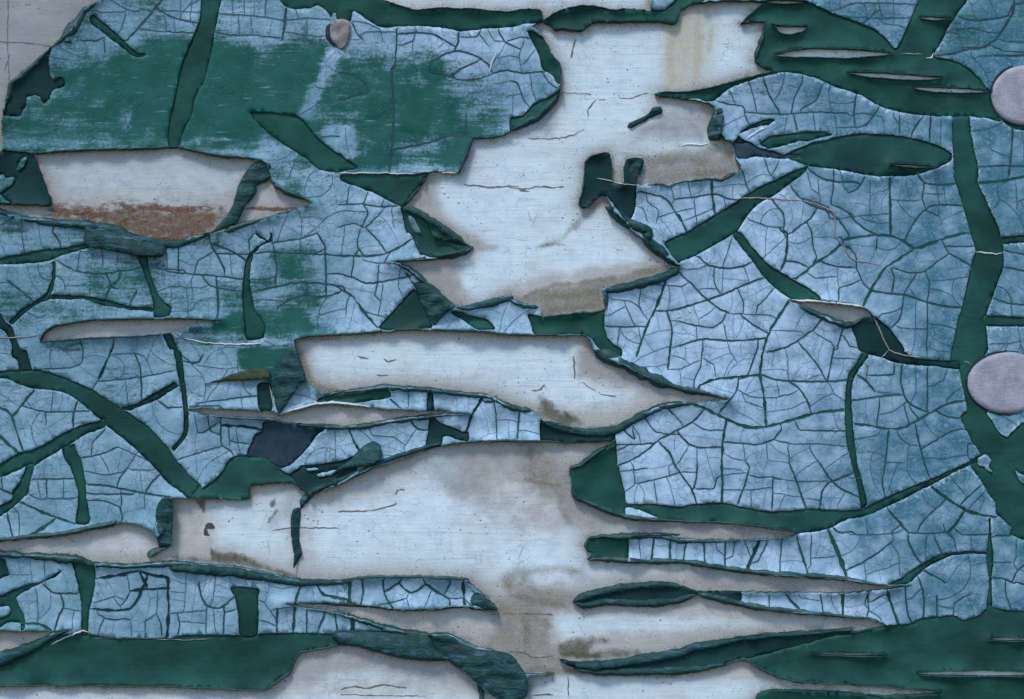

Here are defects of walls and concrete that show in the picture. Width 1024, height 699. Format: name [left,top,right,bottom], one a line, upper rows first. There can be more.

rust [50,203,222,240]
peeling [0,0,313,257]
crack [0,0,328,149]
crack [0,112,553,639]
peeling [0,289,1024,699]
peeling [280,0,1024,327]
crack [338,0,1024,625]
crack [509,651,569,697]